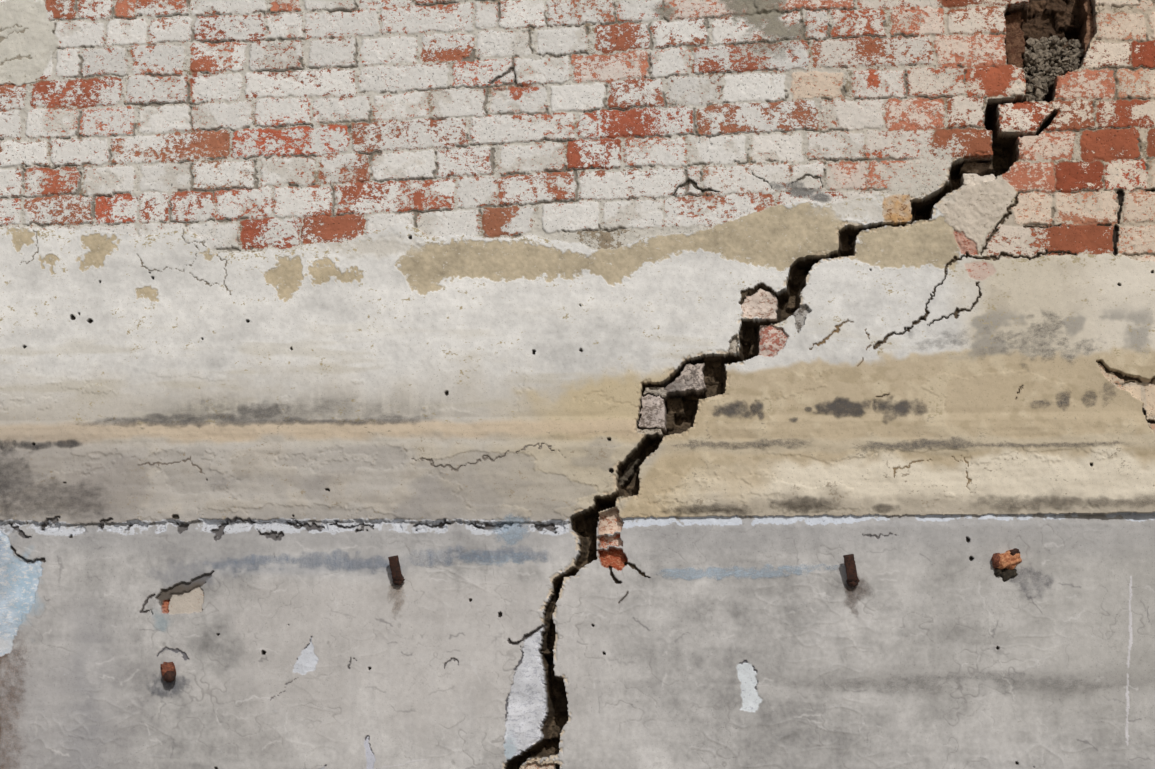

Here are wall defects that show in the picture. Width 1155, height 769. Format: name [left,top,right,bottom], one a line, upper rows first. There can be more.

crack [489,69,517,85]
flaking render [392,202,965,299]
flaking render [1042,253,1155,394]
crack [507,0,1097,769]
crack [412,443,566,472]
peeling [623,515,890,529]
peeling [915,513,1079,522]
peeling [1106,513,1155,523]
spalling [0,517,570,657]
flaking render [504,625,556,769]